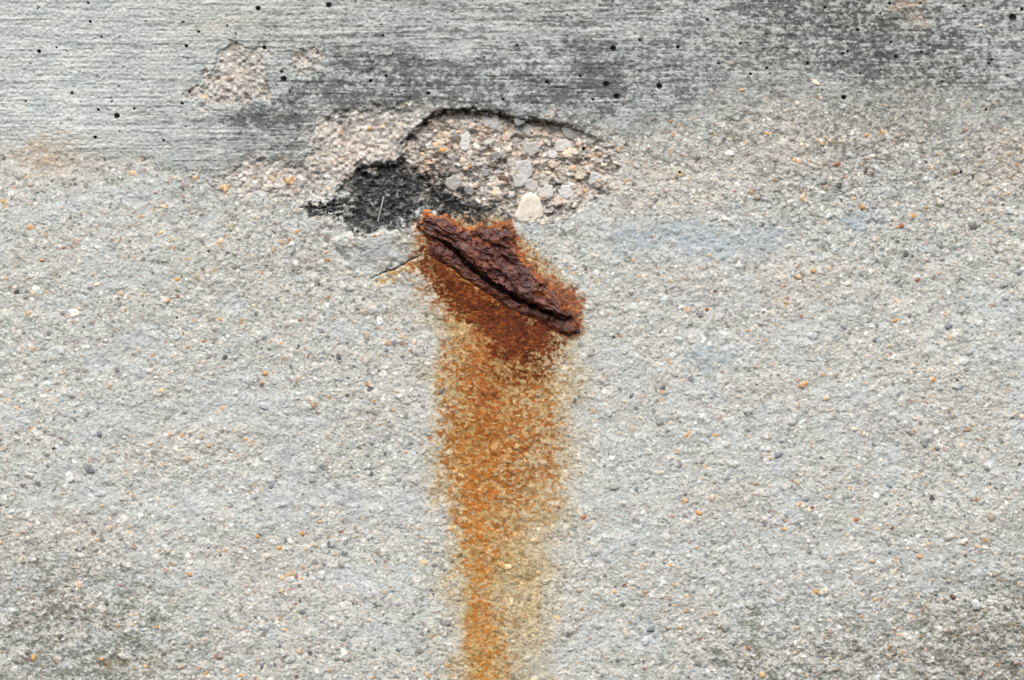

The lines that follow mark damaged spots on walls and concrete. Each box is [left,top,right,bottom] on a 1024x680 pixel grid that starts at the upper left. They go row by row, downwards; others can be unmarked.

peeling [187,40,271,114]
water stain [303,157,509,236]
spalling [226,103,621,226]
rust [380,209,585,680]